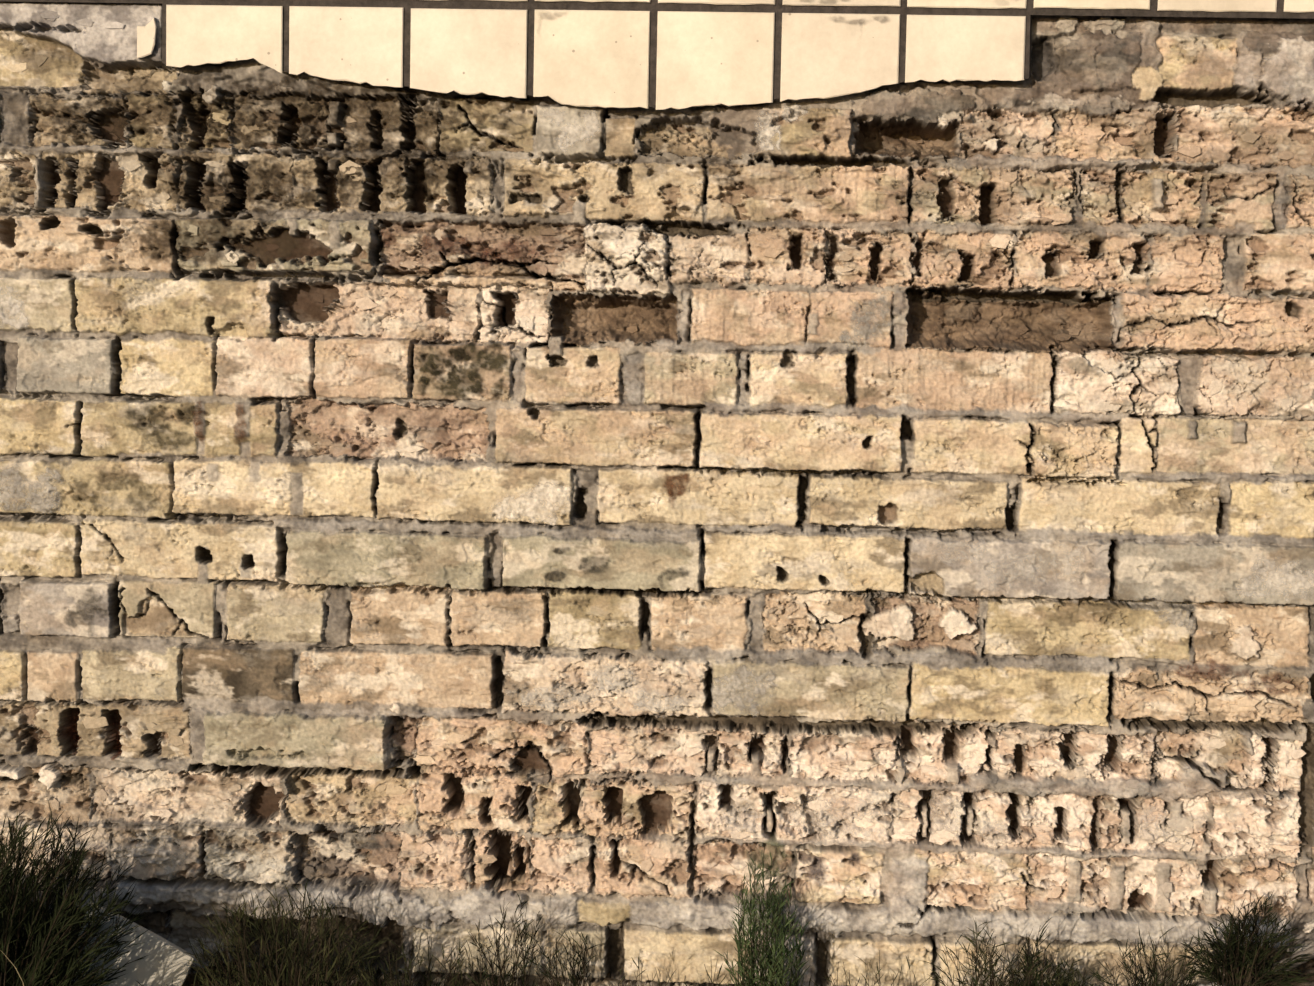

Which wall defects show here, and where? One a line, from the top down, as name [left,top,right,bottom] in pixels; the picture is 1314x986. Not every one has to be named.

spalling [0,2,679,347]
crack [1108,316,1248,470]
crack [91,524,208,637]
crack [1125,680,1292,714]
peeling [0,668,1312,921]